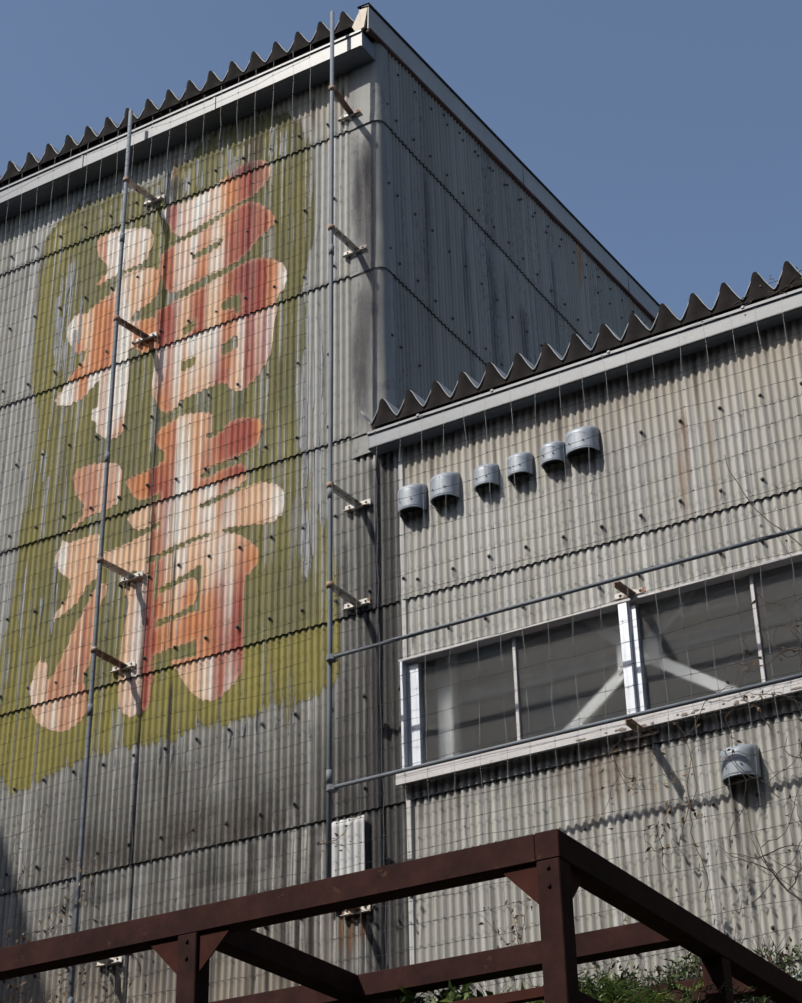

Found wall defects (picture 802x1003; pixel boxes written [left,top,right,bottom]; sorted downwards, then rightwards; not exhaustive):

damp [359,462,406,866]
damp [223,818,258,895]
damp [266,825,323,891]
damp [280,916,322,956]
damp [354,920,366,973]